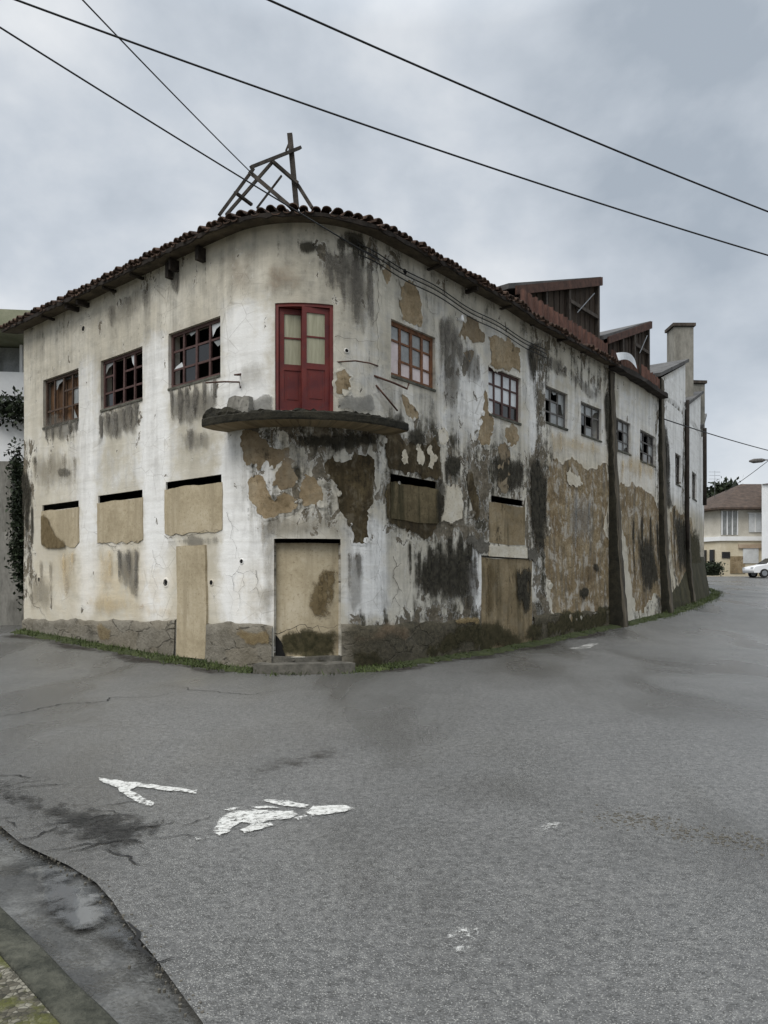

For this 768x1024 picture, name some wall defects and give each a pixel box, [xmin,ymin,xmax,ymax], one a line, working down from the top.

leakage [300,232,374,317]
peeling [380,261,424,330]
leakage [170,379,216,441]
peeling [332,348,354,397]
peeling [457,313,523,376]
leakage [117,549,138,588]
peeling [238,427,490,554]
leakage [409,534,499,612]
leakage [494,456,547,548]
peeling [526,452,694,622]